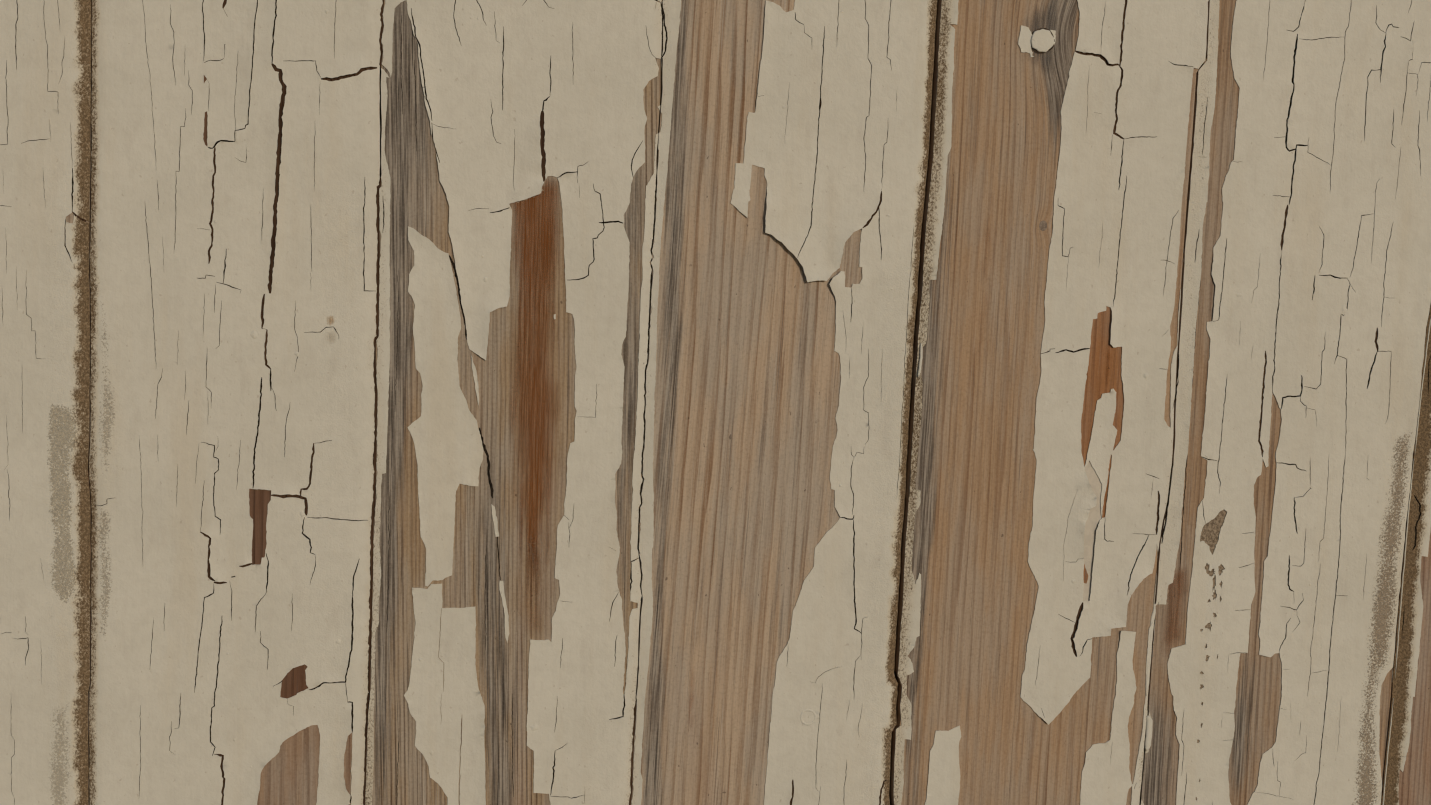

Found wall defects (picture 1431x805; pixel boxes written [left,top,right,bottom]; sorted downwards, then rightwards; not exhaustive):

peeling [249,489,271,565]
crack [98,0,448,805]
peeling [257,725,320,805]
crack [449,255,467,340]
peeling [372,0,576,805]
crack [453,0,657,805]
peeling [615,0,862,805]
peeling [901,0,1239,805]
crack [1060,602,1092,657]
crack [1075,0,1149,301]
peeling [1228,393,1282,805]
crack [1104,0,1431,802]